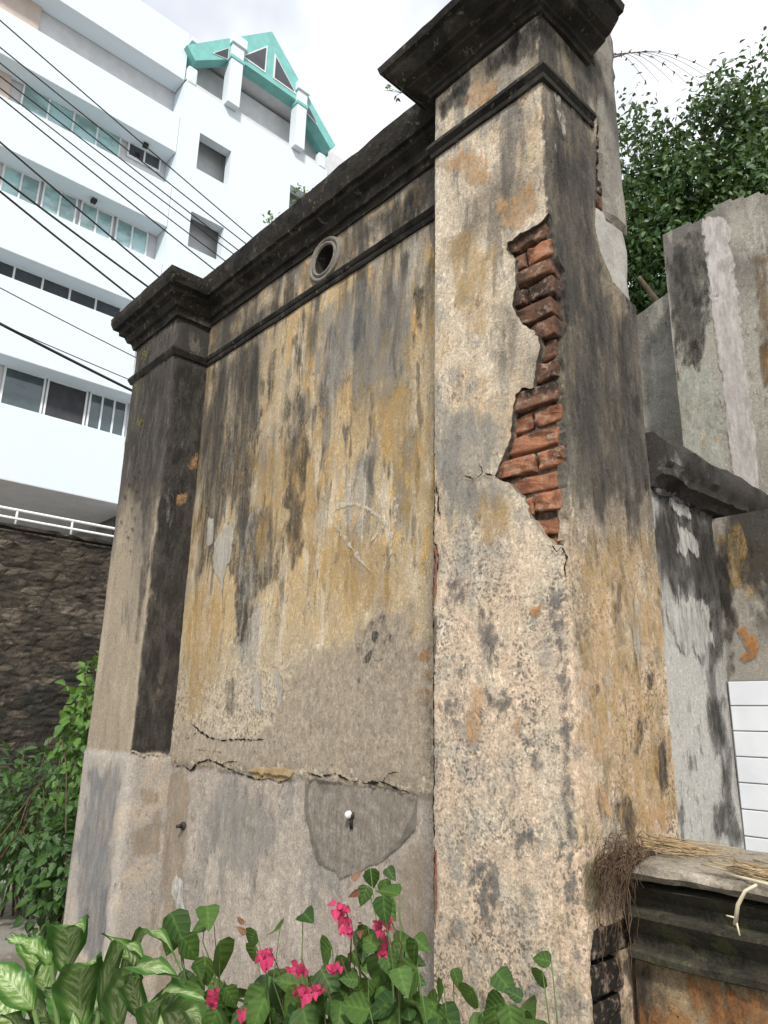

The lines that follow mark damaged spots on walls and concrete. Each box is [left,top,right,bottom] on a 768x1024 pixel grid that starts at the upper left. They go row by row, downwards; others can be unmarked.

water stain [315,277,424,395]
spalling [497,222,568,545]
water stain [551,100,649,546]
water stain [124,283,315,754]
crack [131,392,441,928]
mould [358,615,399,671]
water stain [655,495,739,676]
rust [737,626,760,661]
water stain [617,797,635,834]
water stain [655,738,668,789]
water stain [708,697,743,847]